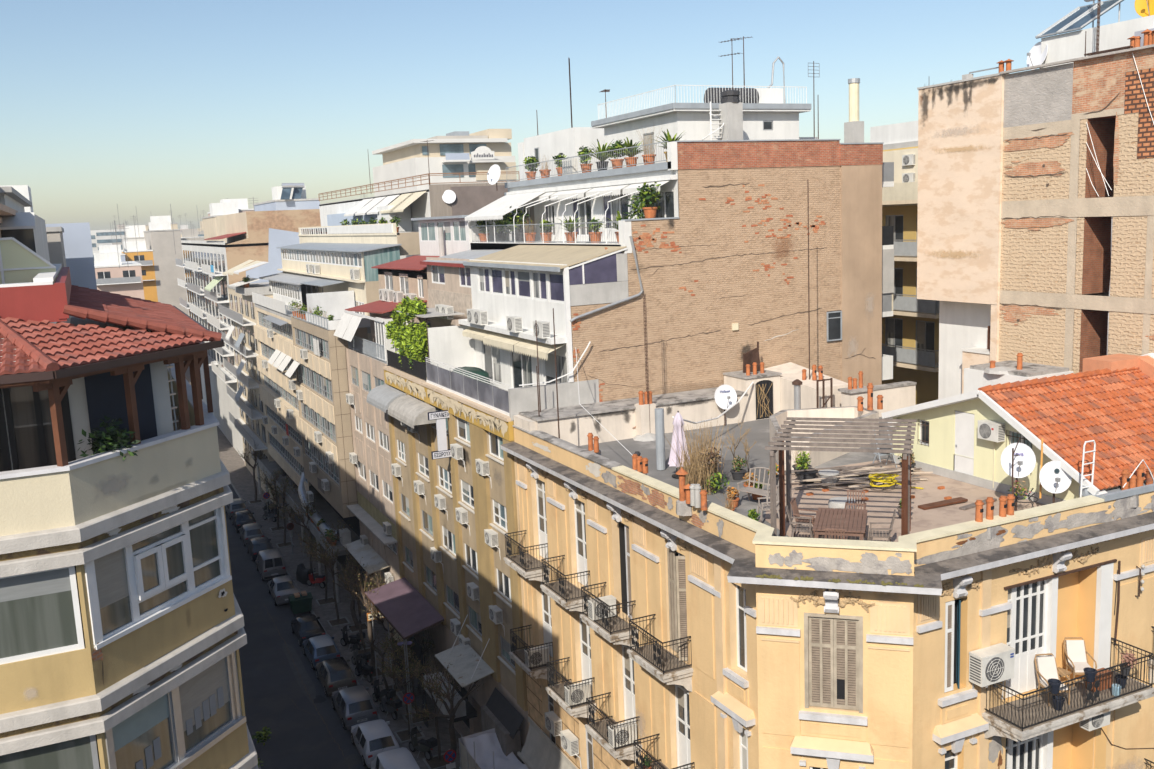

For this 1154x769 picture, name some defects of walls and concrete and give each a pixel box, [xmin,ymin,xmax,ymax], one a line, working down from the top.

leakage [922,78,996,115]
spalling [1004,132,1074,186]
crack [632,245,823,272]
spalling [768,495,1154,575]